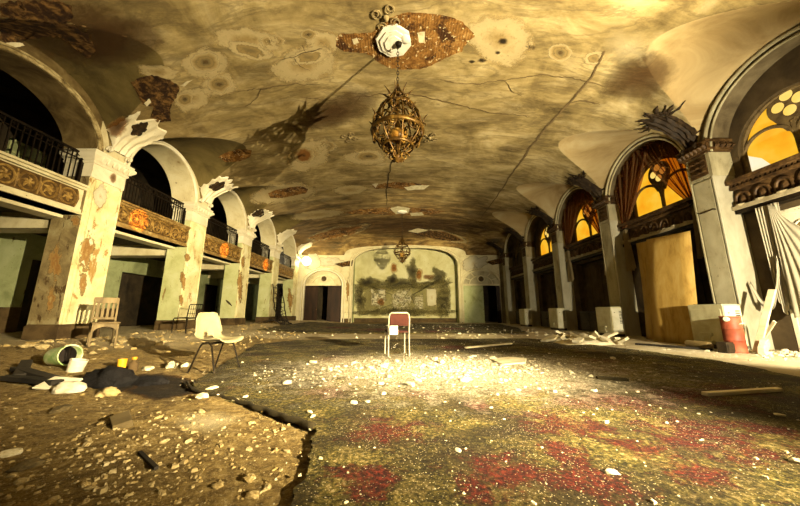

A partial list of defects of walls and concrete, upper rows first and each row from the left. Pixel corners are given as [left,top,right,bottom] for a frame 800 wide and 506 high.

spalling [0,0,95,58]
water stain [138,27,338,112]
spalling [336,12,475,70]
water stain [467,16,534,67]
spalling [131,75,192,136]
crack [232,45,606,219]
spalling [268,186,308,198]
peeling [78,230,96,296]
peeling [179,252,190,306]
water stain [345,258,458,318]